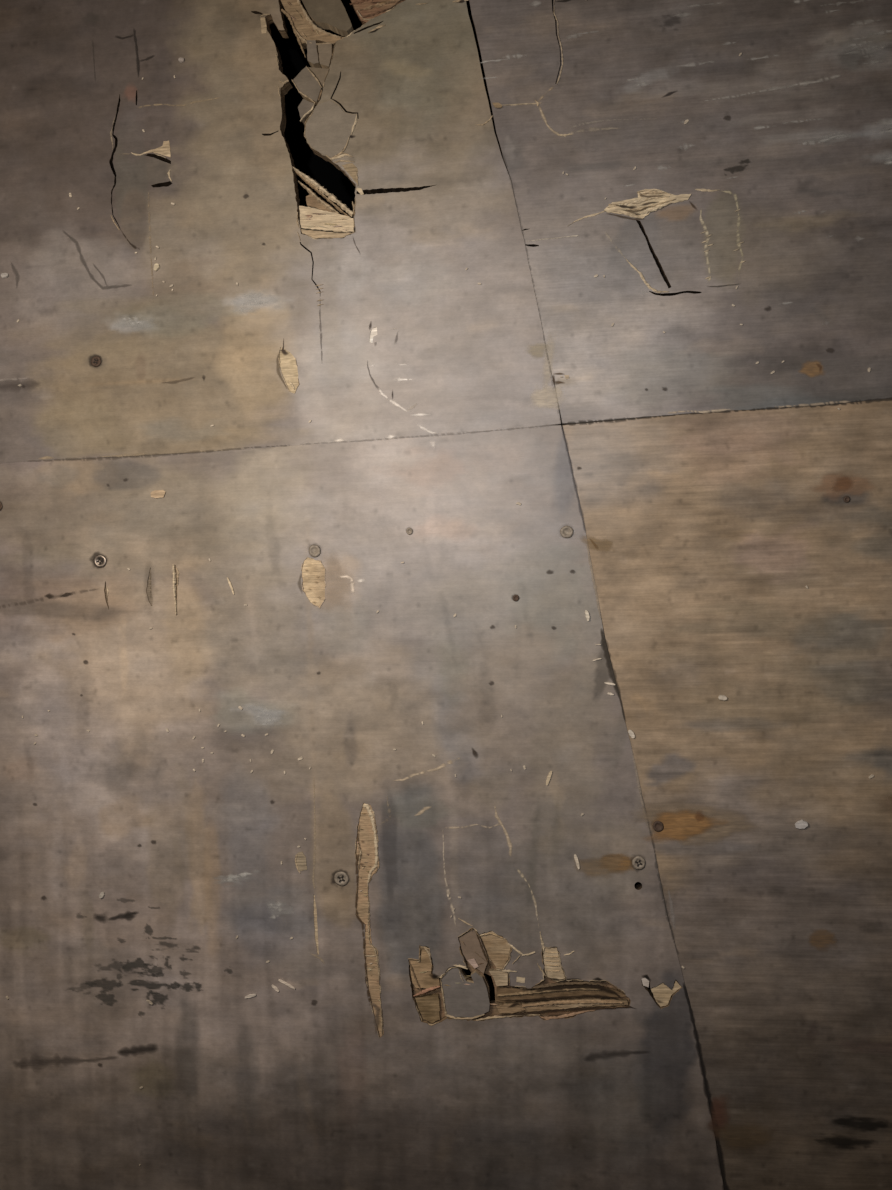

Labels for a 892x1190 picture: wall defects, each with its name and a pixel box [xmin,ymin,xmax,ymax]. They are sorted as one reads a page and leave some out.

crack [109,31,153,248]
spalling [277,340,299,394]
spalling [298,557,326,608]
spalling [355,803,384,1039]
spalling [641,975,681,1007]